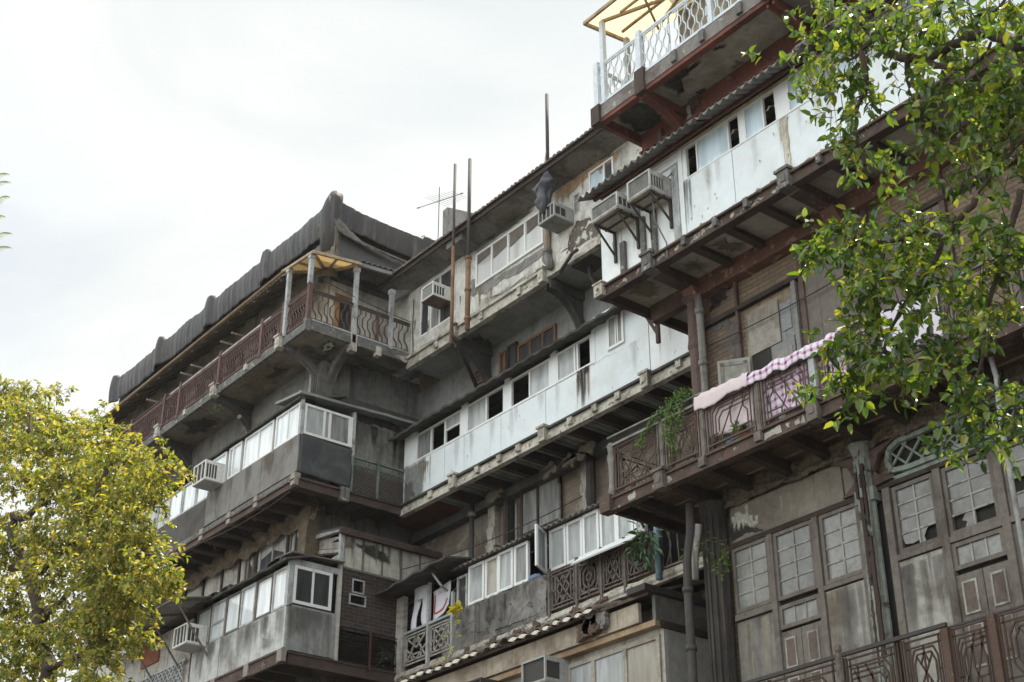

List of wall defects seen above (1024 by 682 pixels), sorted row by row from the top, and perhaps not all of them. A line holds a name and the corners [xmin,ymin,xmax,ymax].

peeling [569,217,601,252]
leakage [576,367,589,402]
peeling [731,504,764,542]
spalling [569,596,610,643]